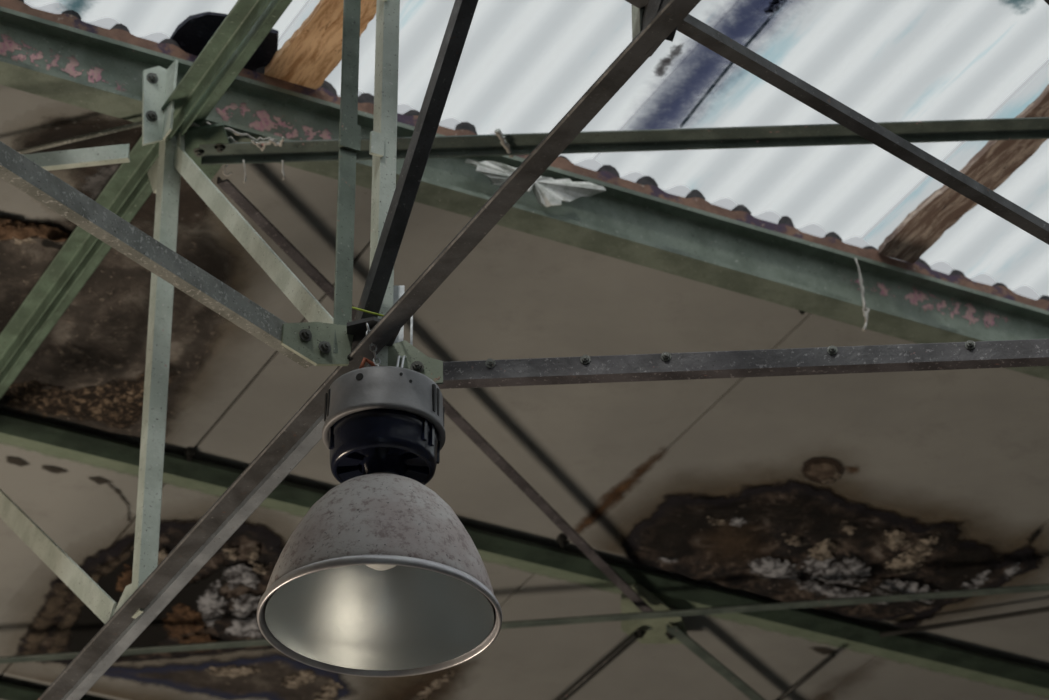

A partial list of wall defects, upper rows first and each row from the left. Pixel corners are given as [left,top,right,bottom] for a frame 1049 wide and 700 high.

peeling [0,34,124,90]
damp [23,117,142,155]
peeling [216,103,334,140]
damp [72,163,122,201]
damp [130,192,156,223]
damp [178,176,208,230]
corrosion [576,456,660,532]
peeling [80,533,135,609]
peeling [115,520,285,663]
peeling [609,480,1044,628]
peeling [16,578,105,665]
damp [103,653,351,700]